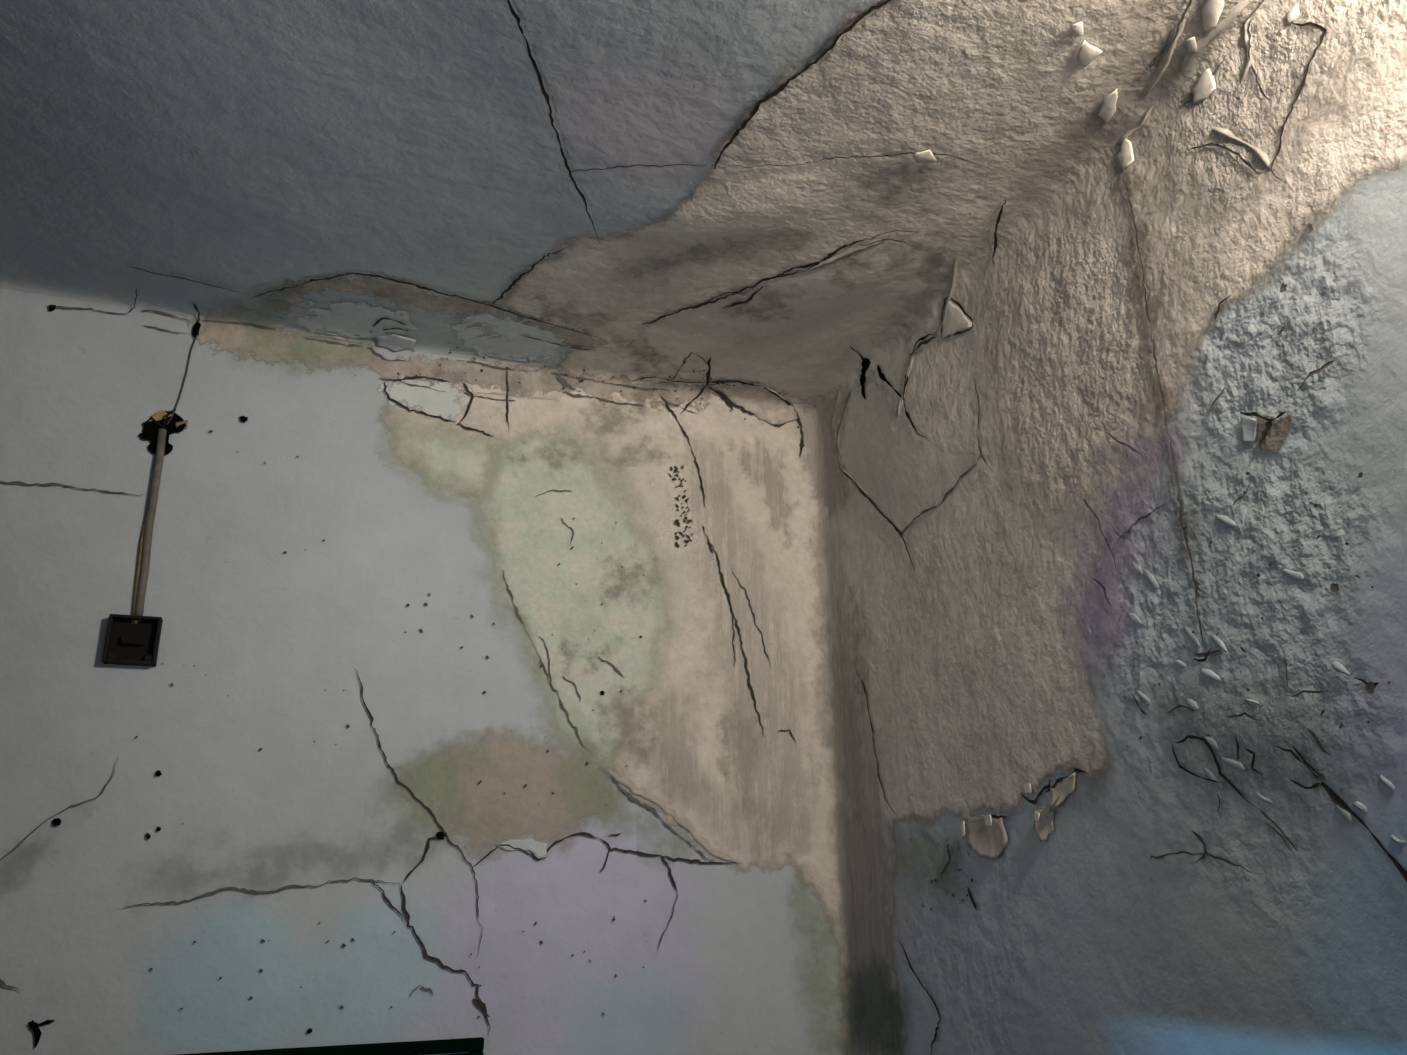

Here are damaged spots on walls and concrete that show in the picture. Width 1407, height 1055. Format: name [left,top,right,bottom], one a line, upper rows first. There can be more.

crack [0,481,144,496]
peeling [262,272,595,363]
peeling [197,297,711,412]
crack [48,0,986,337]
water stain [392,430,669,761]
water stain [802,386,847,511]
peeling [378,0,1407,1055]
crack [992,199,1006,265]
crack [0,760,118,860]
crack [124,669,741,1036]
water stain [812,526,903,1055]
crack [1132,694,1407,883]